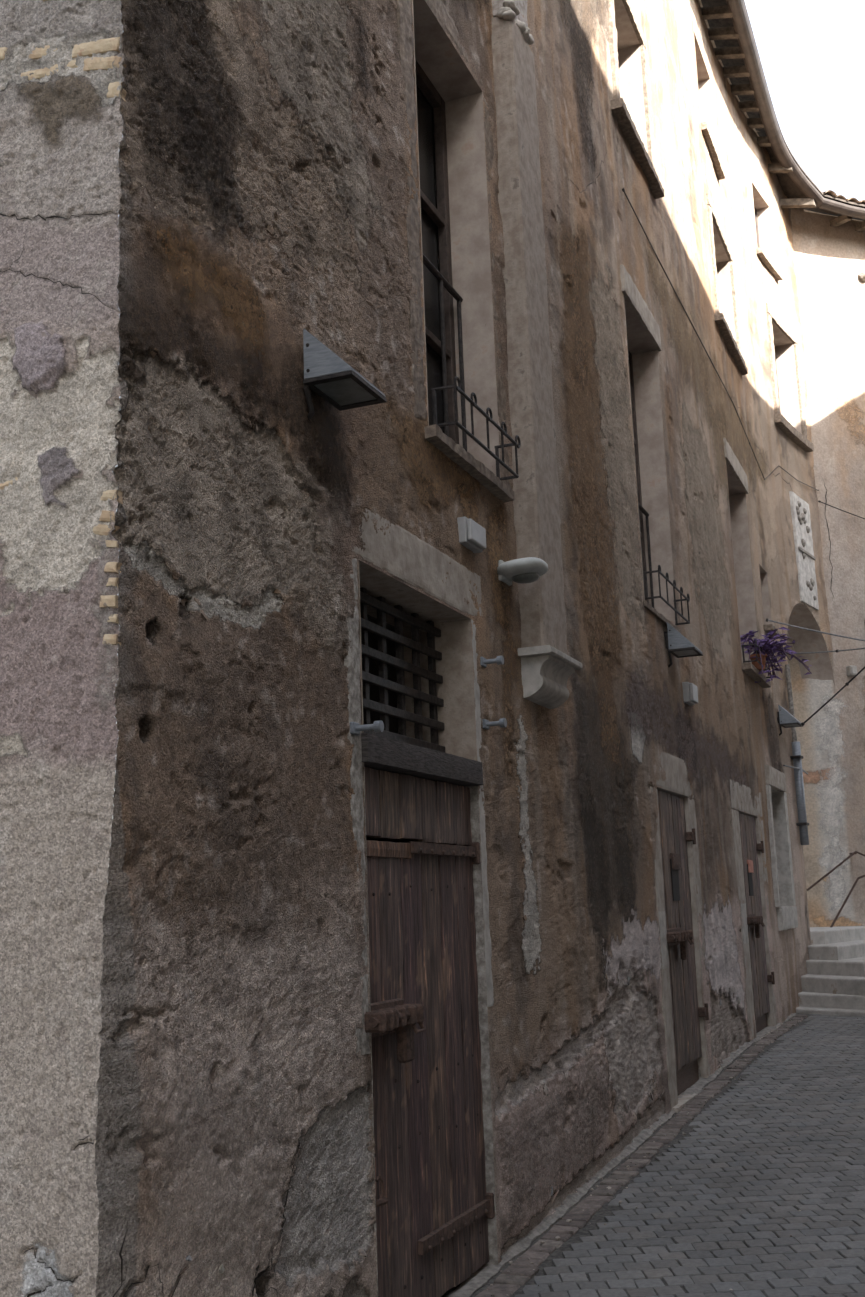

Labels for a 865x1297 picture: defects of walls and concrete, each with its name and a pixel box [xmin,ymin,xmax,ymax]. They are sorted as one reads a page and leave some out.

water stain [19,72,102,145]
spalling [0,0,383,289]
crack [0,211,114,309]
water stain [118,292,351,519]
spalling [0,337,318,707]
peeling [16,1244,78,1297]